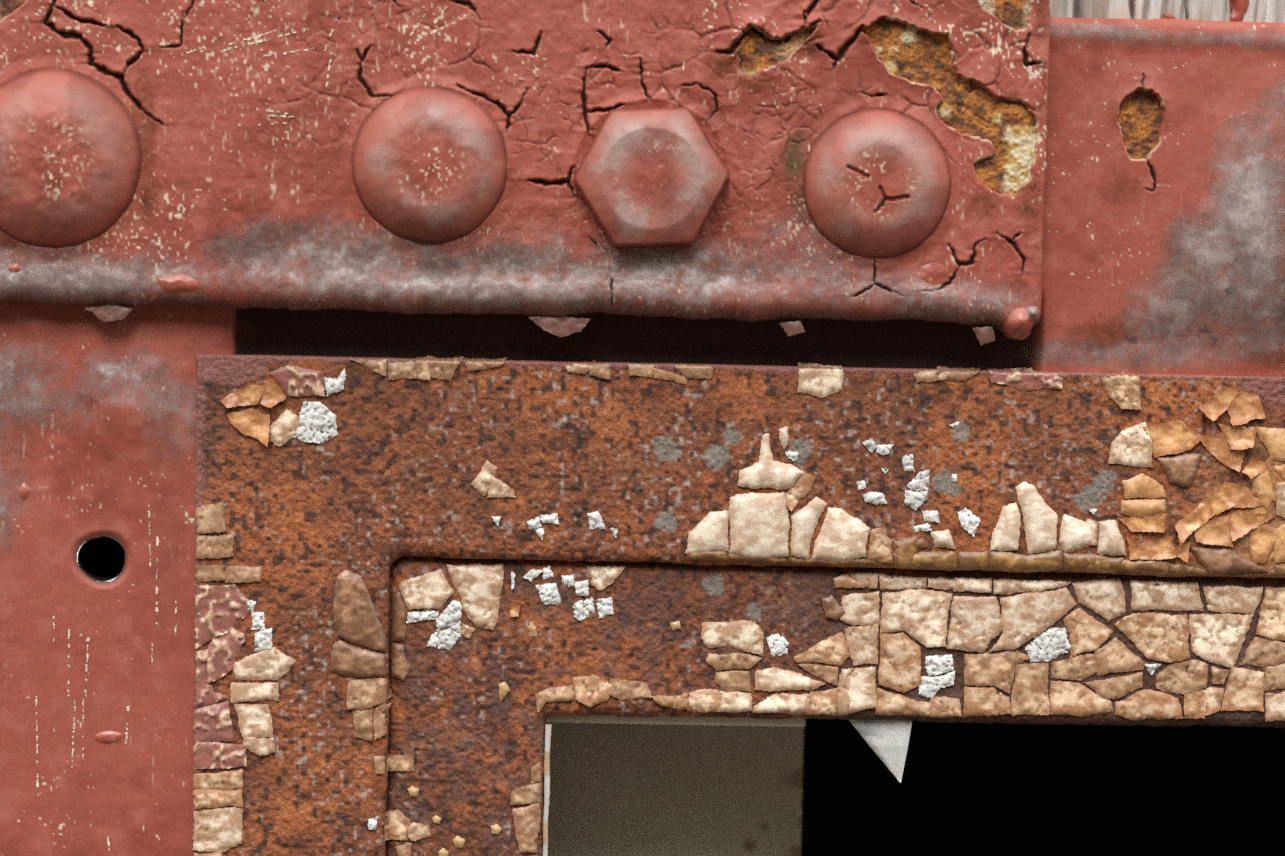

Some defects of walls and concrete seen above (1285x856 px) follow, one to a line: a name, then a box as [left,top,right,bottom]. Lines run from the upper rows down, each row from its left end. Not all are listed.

crack [44,0,194,116]
crack [460,87,520,130]
crack [582,31,648,133]
crack [720,0,862,66]
crack [532,172,573,191]
crack [940,245,976,289]
peeling [221,355,508,447]
peeling [797,363,844,398]
peeling [536,374,1285,722]
peeling [192,502,296,856]
peeling [330,563,626,797]
peeling [368,809,441,856]